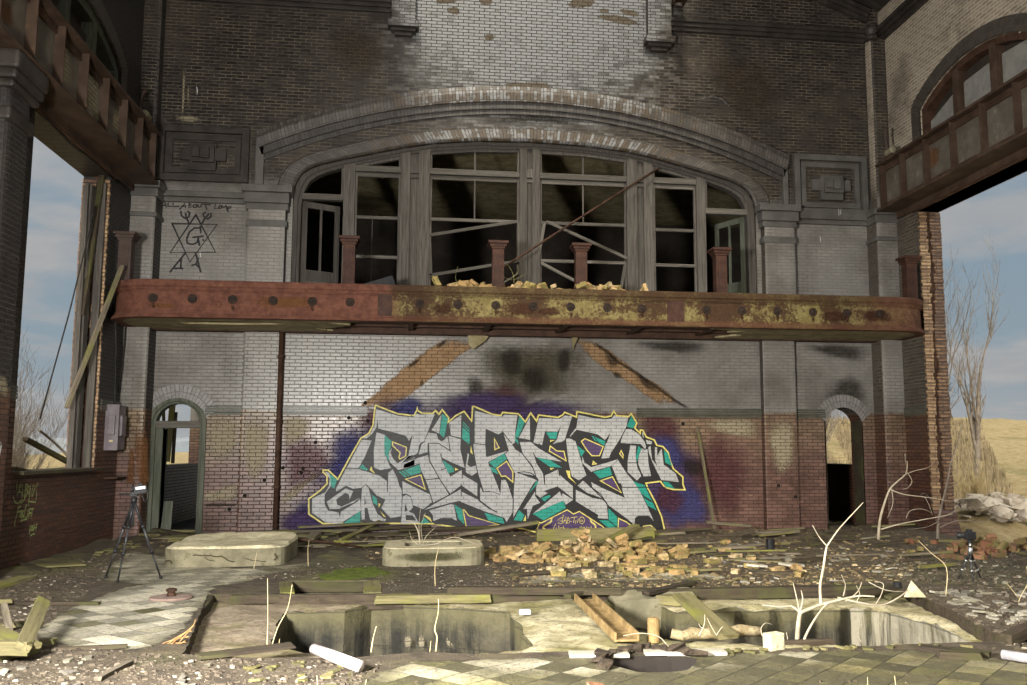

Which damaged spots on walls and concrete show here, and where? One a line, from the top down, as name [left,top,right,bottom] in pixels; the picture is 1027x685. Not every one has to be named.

peeling [436,0,460,15]
peeling [568,0,640,25]
corrosion [495,304,573,317]
damp [488,350,573,394]